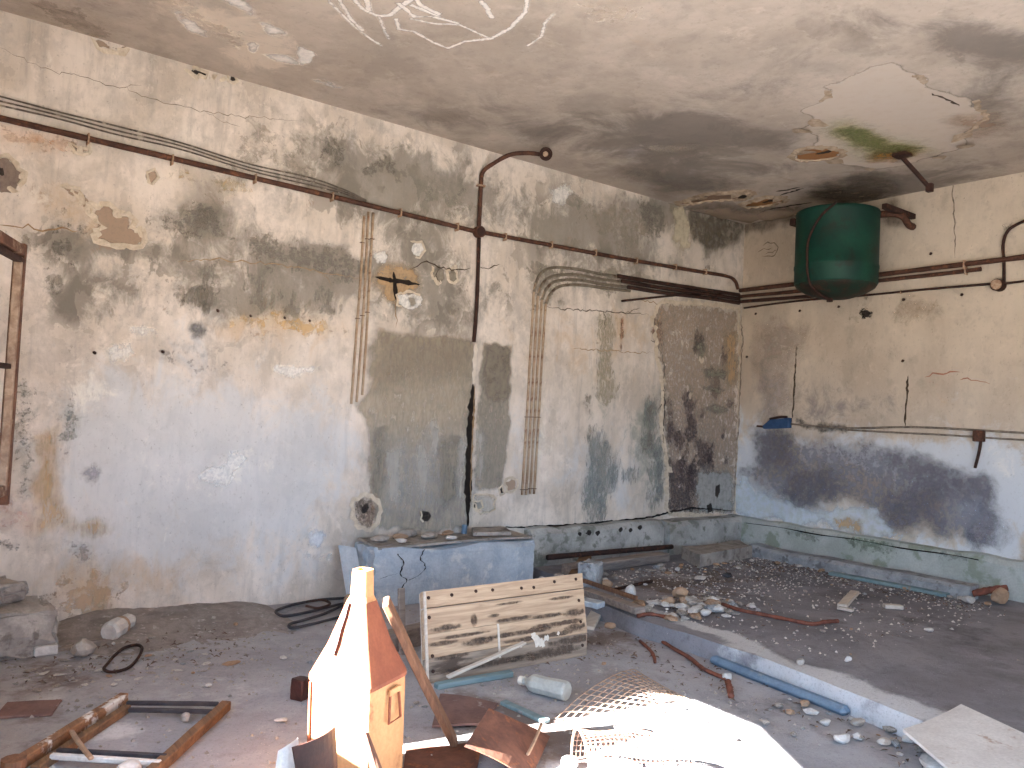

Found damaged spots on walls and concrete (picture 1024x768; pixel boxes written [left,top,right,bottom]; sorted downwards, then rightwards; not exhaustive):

crack [2,48,300,127]
peeling [787,63,991,171]
spalling [0,153,28,193]
peeling [57,183,148,250]
water stain [818,176,895,206]
water stain [250,234,365,282]
crack [412,260,499,282]
peeling [650,298,741,517]
crack [506,300,989,561]
water stain [735,430,993,544]
spalling [349,492,532,550]
crack [384,549,426,588]